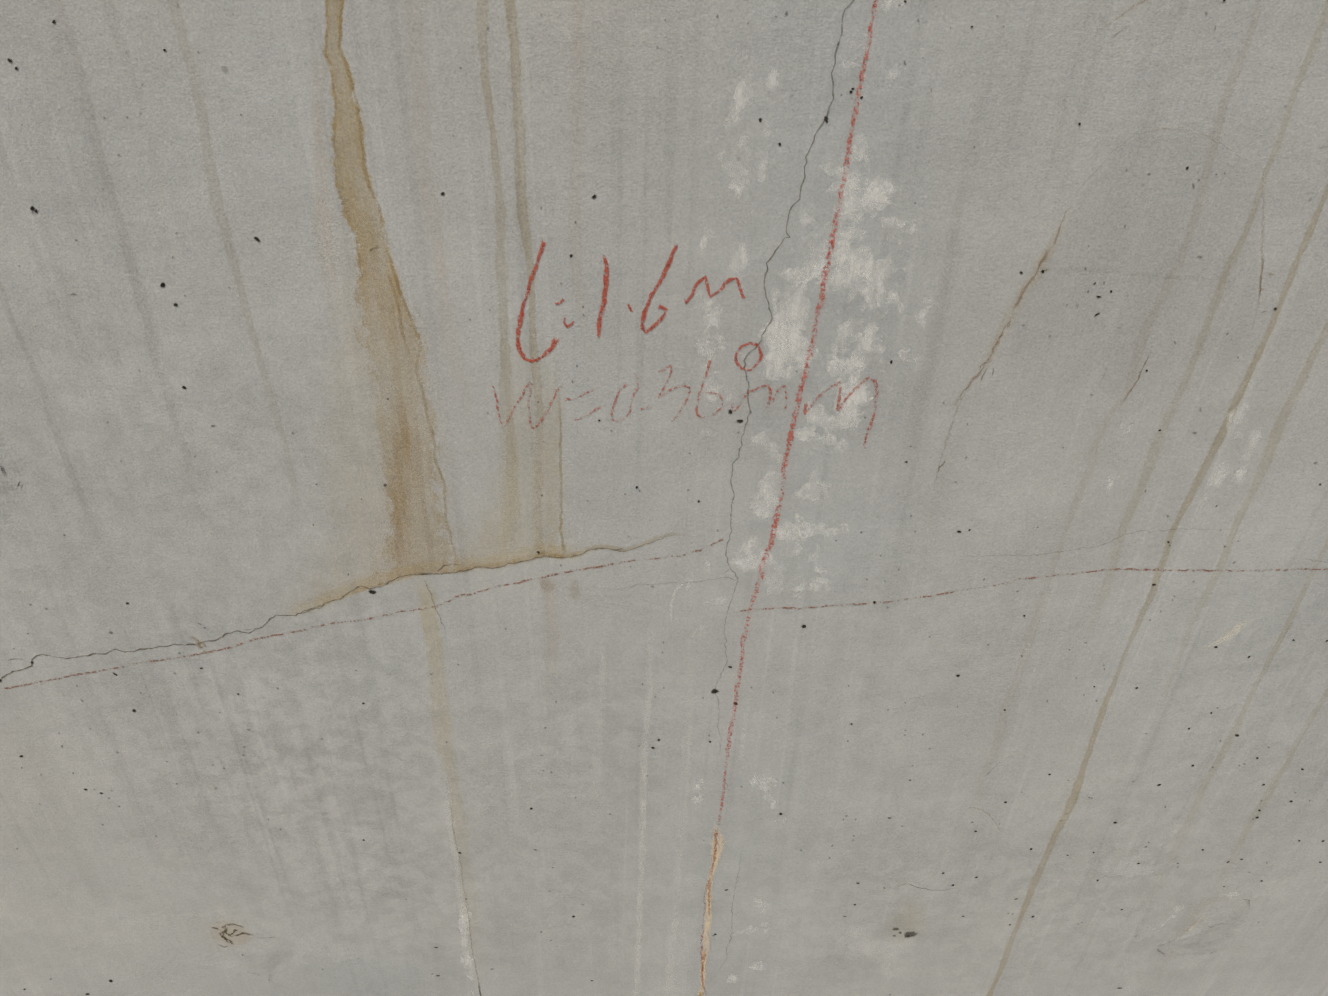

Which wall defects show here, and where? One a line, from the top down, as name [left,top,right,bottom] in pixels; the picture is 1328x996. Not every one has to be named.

crack [731,0,854,509]